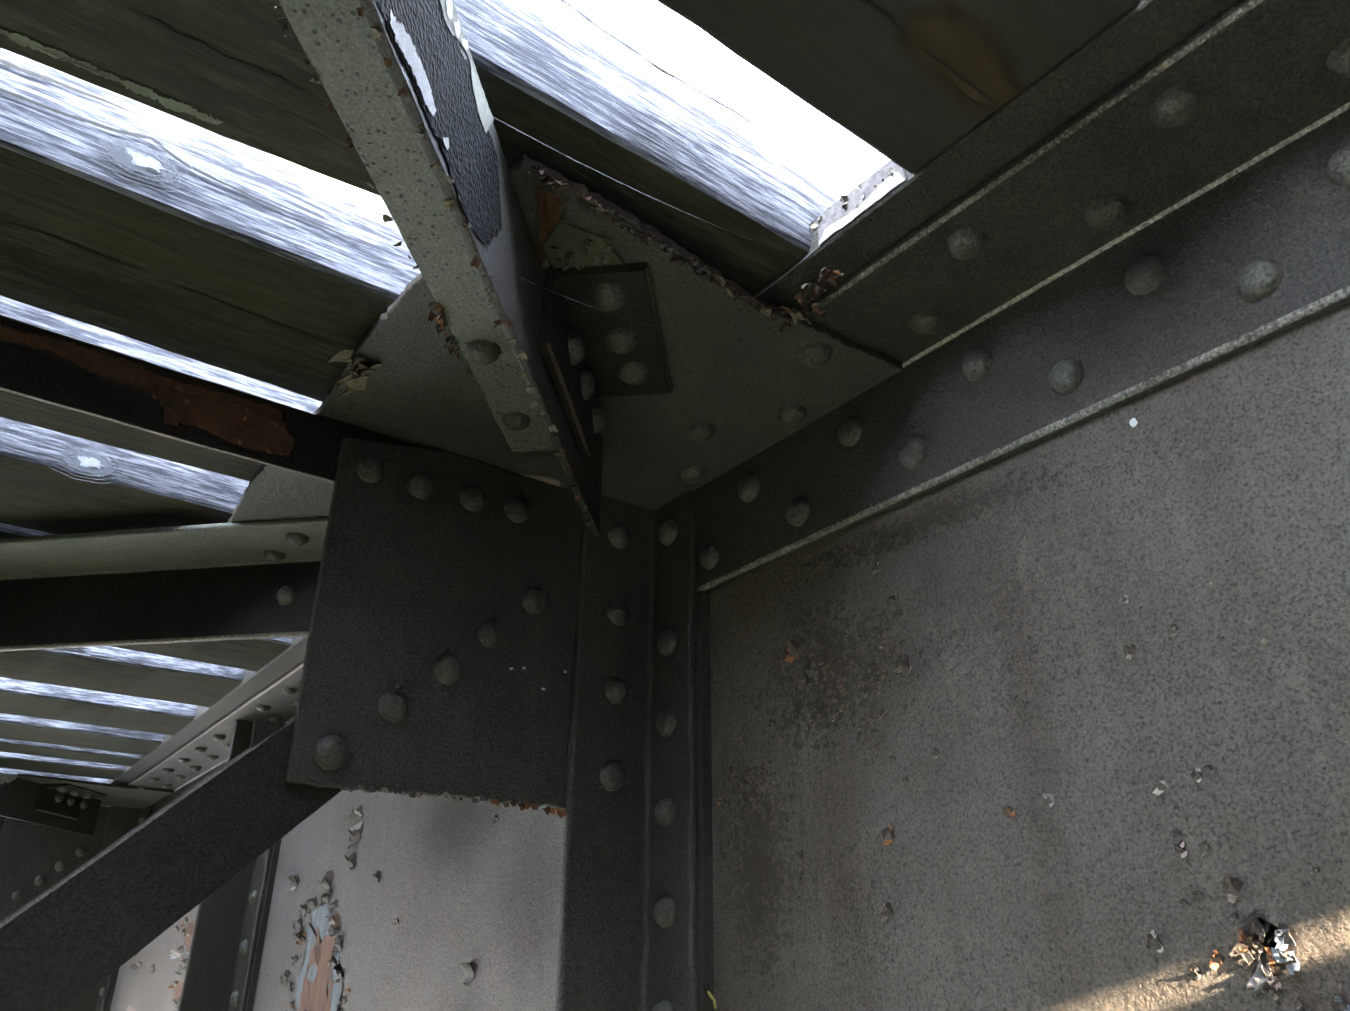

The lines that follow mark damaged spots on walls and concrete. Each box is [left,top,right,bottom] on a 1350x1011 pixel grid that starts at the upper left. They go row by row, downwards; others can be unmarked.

peeling [377,0,502,251]
corrosion [526,164,777,321]
corrosion [0,321,296,459]
corrosion [347,783,566,819]
peeling [278,805,364,1011]
peeling [1187,877,1308,1011]